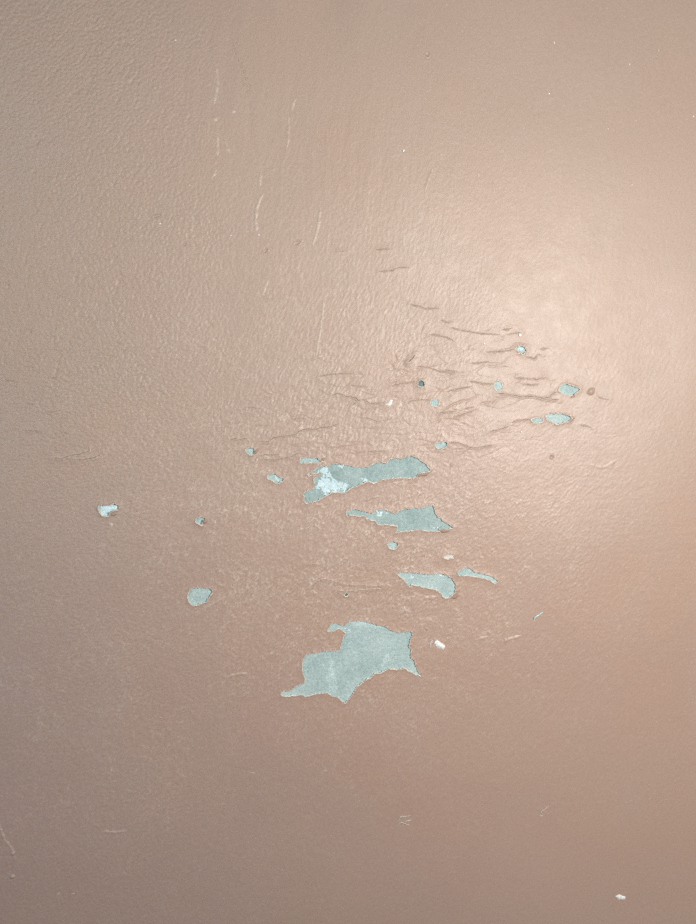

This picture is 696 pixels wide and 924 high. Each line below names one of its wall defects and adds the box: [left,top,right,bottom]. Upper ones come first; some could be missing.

peeling [557,381,583,398]
peeling [529,412,575,426]
peeling [298,454,433,506]
peeling [96,501,121,519]
peeling [345,503,456,551]
peeling [186,586,215,608]
peeling [396,552,499,600]
peeling [279,619,422,705]